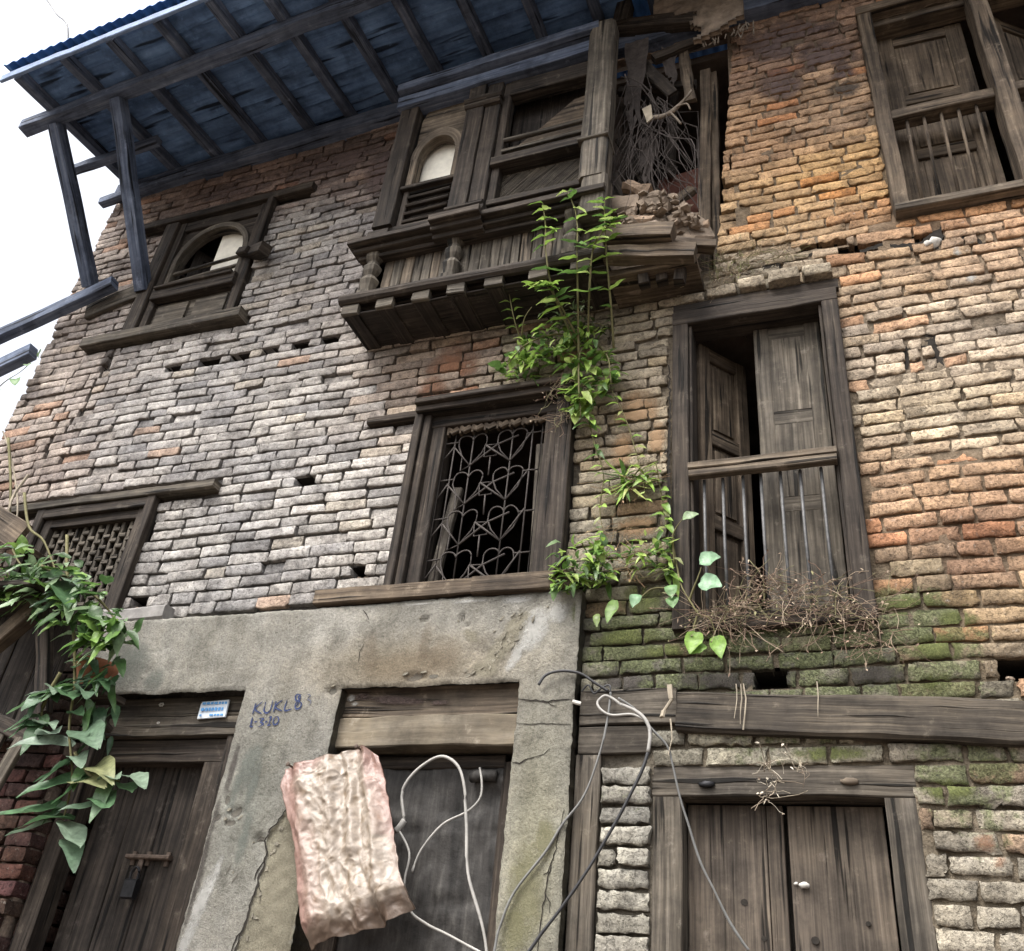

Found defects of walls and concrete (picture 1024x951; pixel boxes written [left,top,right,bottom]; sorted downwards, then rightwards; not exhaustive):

leakage [604,670,641,688]
leakage [684,673,755,692]
crack [512,699,571,764]
crack [231,810,286,951]
crack [537,811,564,951]